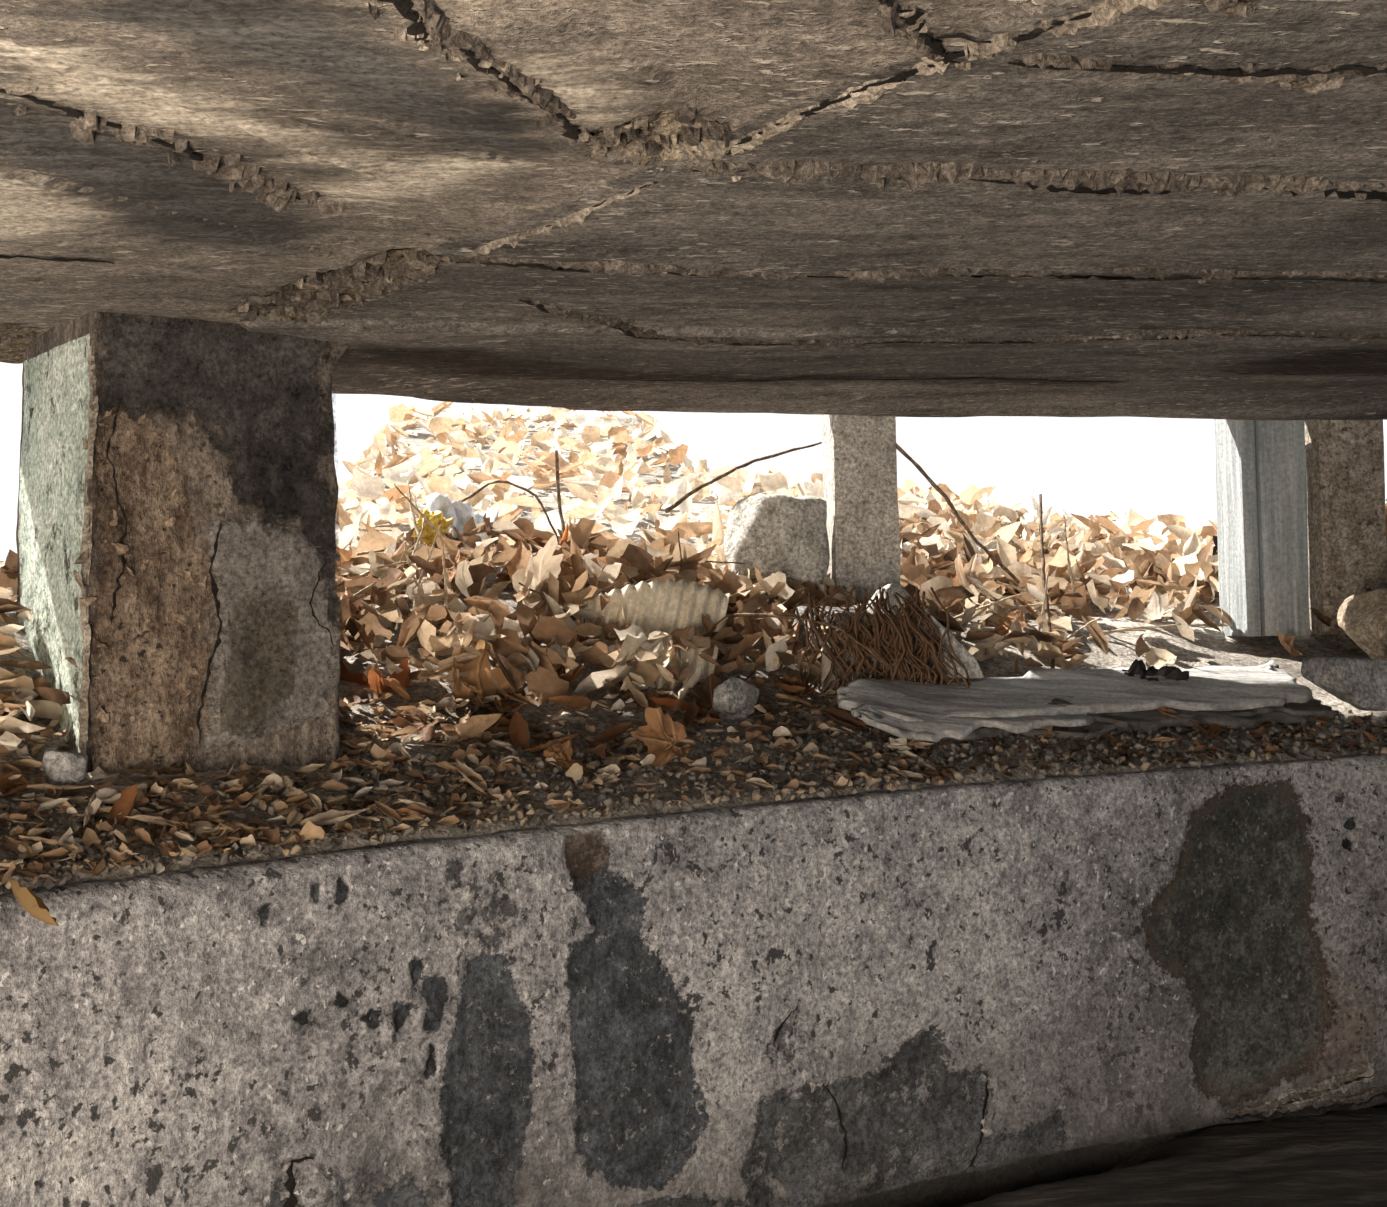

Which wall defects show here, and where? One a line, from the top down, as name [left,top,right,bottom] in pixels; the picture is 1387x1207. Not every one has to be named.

crack [0,84,344,215]
crack [368,0,604,146]
crack [692,0,1387,201]
crack [0,255,114,264]
crack [283,181,1387,348]
damp [307,857,538,1207]
damp [563,831,751,1207]
damp [1140,779,1337,1111]